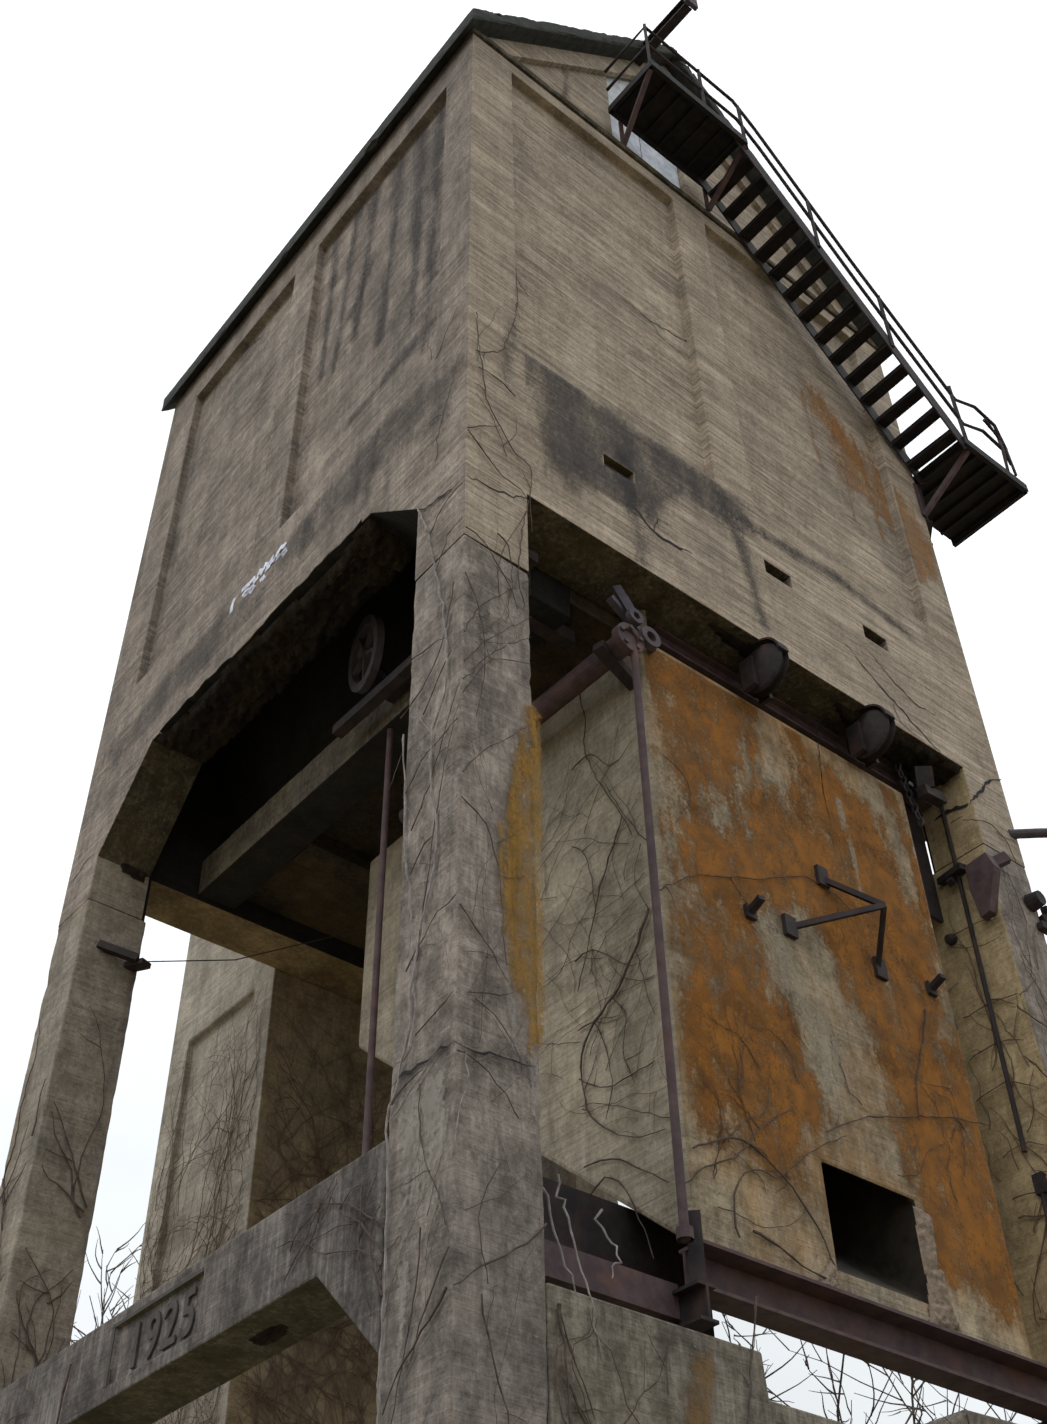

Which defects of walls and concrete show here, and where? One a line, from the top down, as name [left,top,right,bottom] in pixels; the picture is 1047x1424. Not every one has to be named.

water stain [320,112,445,374]
water stain [528,358,907,633]
corrosion [498,706,545,1054]
corrosion [644,650,1022,1327]